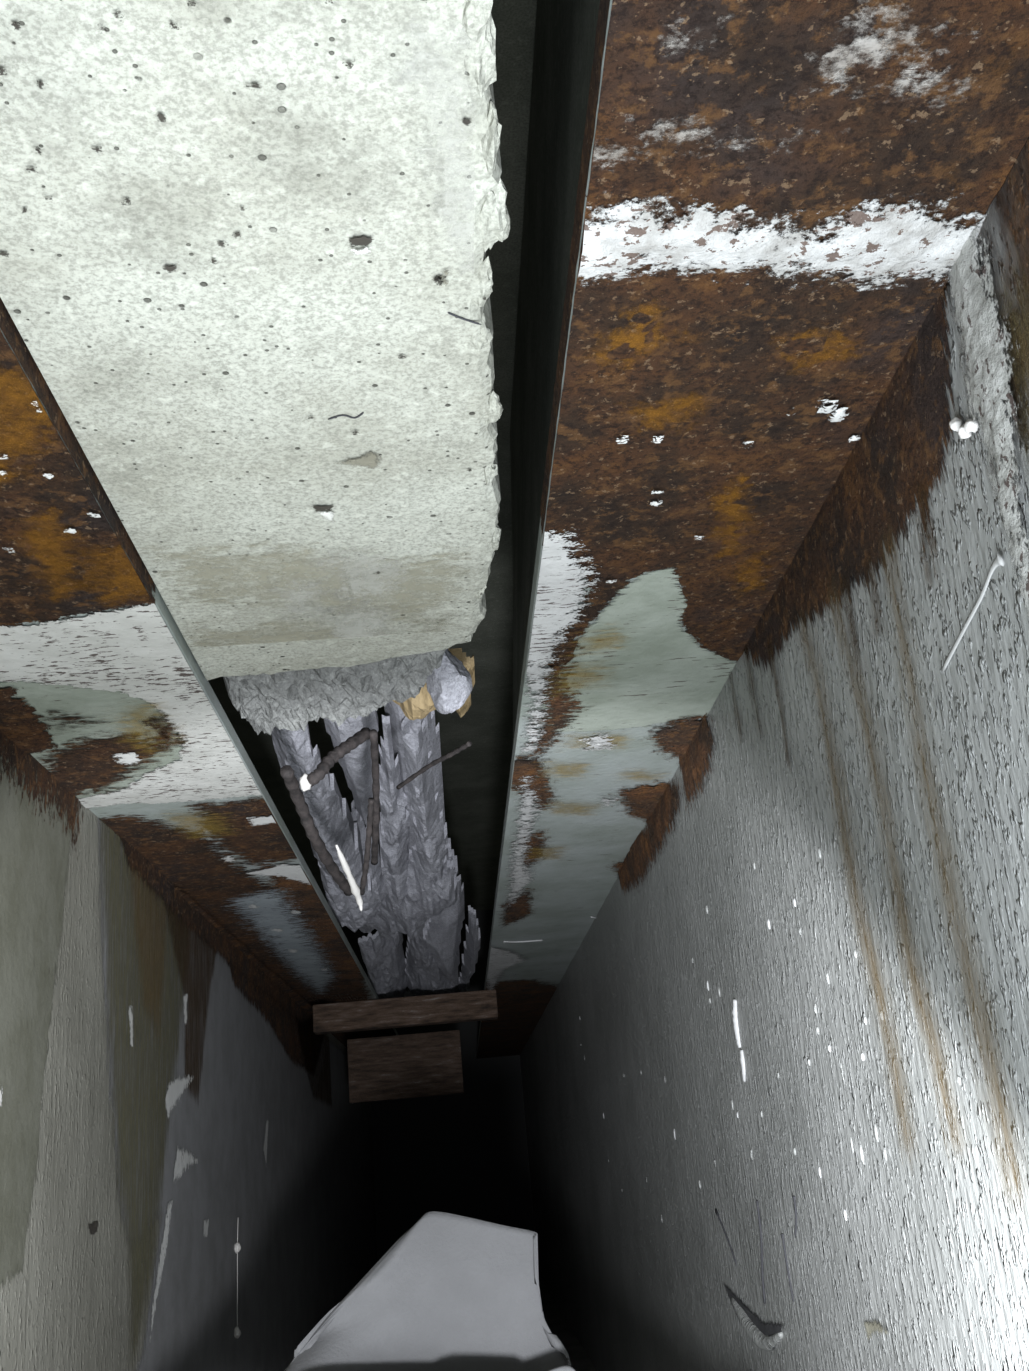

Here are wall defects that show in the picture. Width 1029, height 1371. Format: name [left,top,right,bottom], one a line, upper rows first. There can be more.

corrosion [0,297,156,627]
corrosion [540,0,1029,766]
peeling [0,603,375,1287]
corrosion [119,835,396,1105]
spalling [223,649,472,896]
corrosion [606,713,716,894]